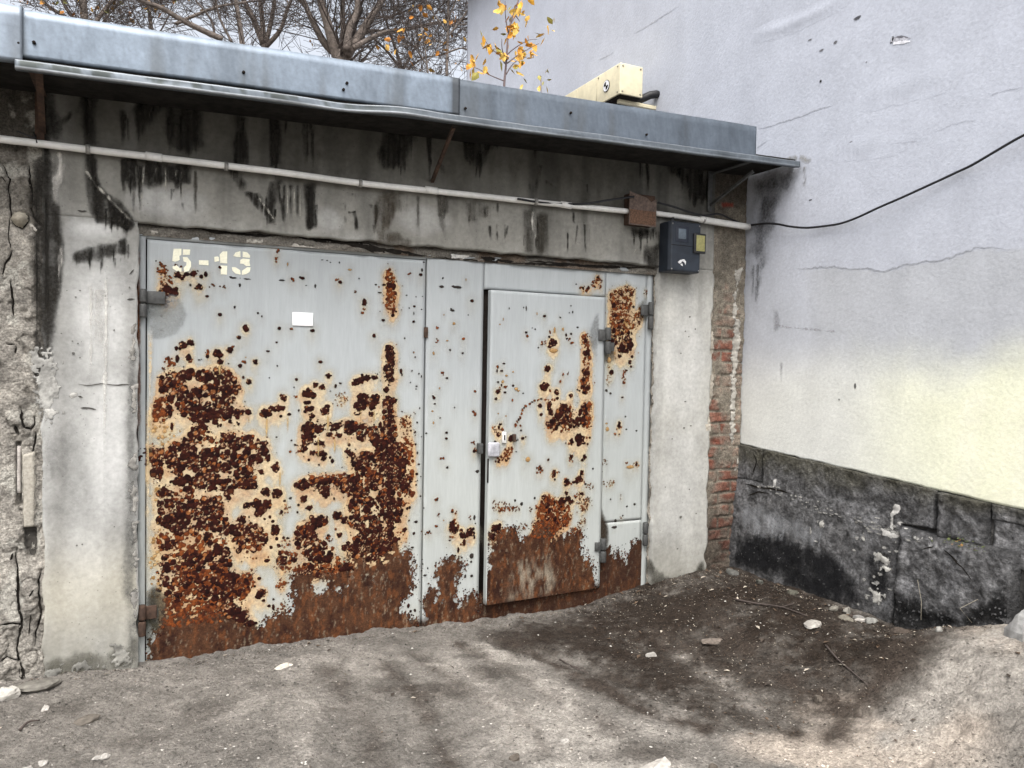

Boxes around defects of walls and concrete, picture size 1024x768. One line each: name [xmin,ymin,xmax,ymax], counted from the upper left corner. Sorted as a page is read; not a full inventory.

spalling [890,35,910,45]
water stain [121,103,203,202]
water stain [230,116,318,230]
corrosion [155,260,226,317]
corrosion [375,261,425,323]
water stain [525,211,548,253]
water stain [632,229,660,268]
crack [795,247,1009,272]
spalling [29,341,81,425]
corrosion [138,275,647,661]
spalling [23,527,37,555]
crack [2,549,42,680]